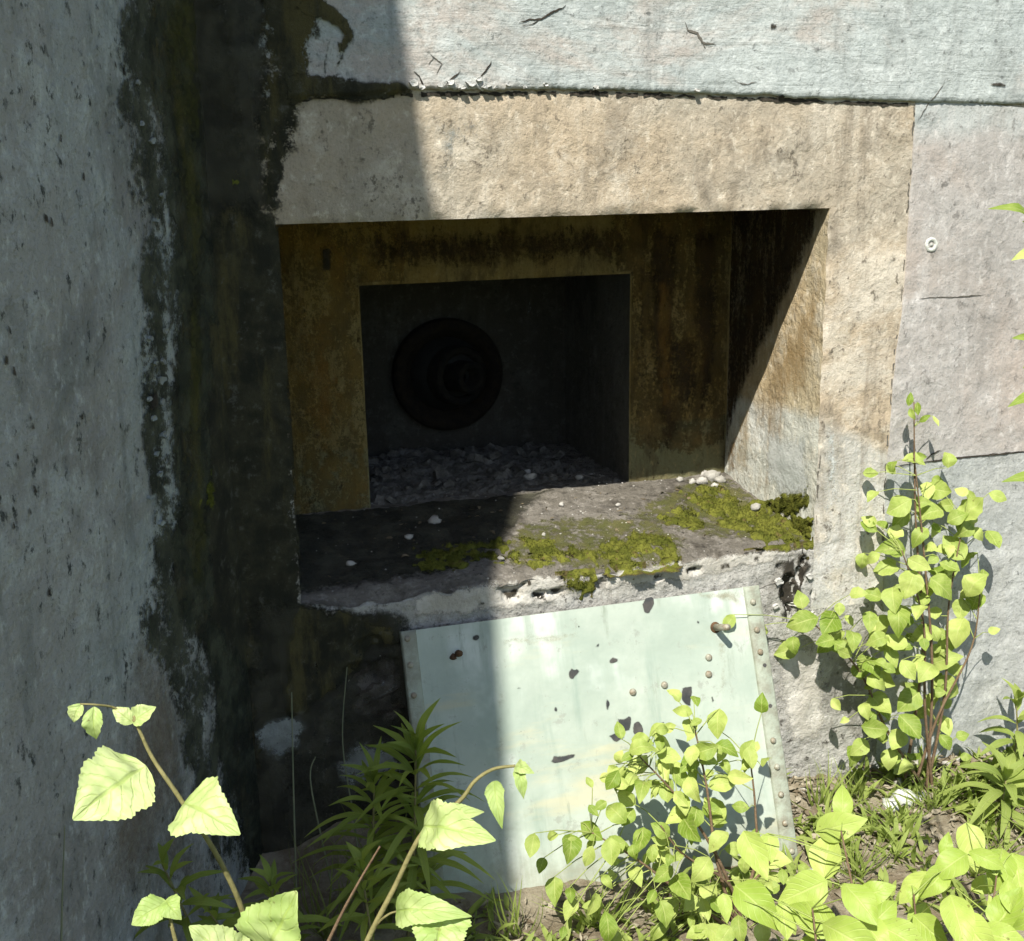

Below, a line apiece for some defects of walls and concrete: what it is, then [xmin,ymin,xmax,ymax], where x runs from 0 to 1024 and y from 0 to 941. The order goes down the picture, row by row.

crack [519,5,566,26]
crack [685,22,716,49]
crack [901,260,986,301]
water stain [113,0,551,878]
water stain [767,435,807,495]
crack [882,435,1024,541]
spalling [415,545,816,622]